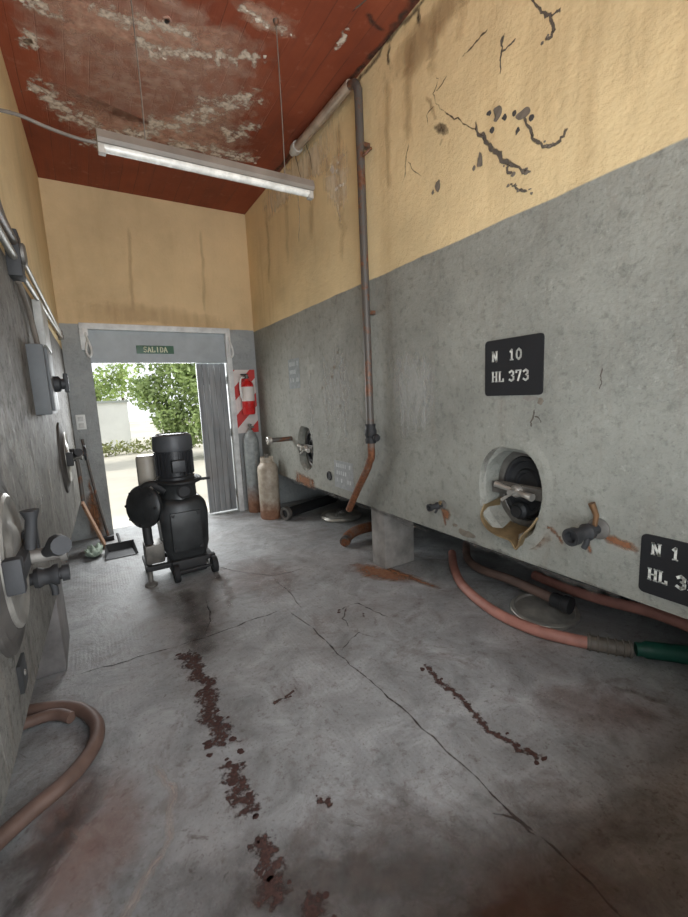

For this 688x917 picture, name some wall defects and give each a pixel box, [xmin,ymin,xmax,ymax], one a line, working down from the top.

peeling [238,2,292,36]
crack [531,0,561,45]
crack [463,30,515,72]
crack [427,77,533,195]
crack [523,118,568,148]
crack [190,567,617,912]